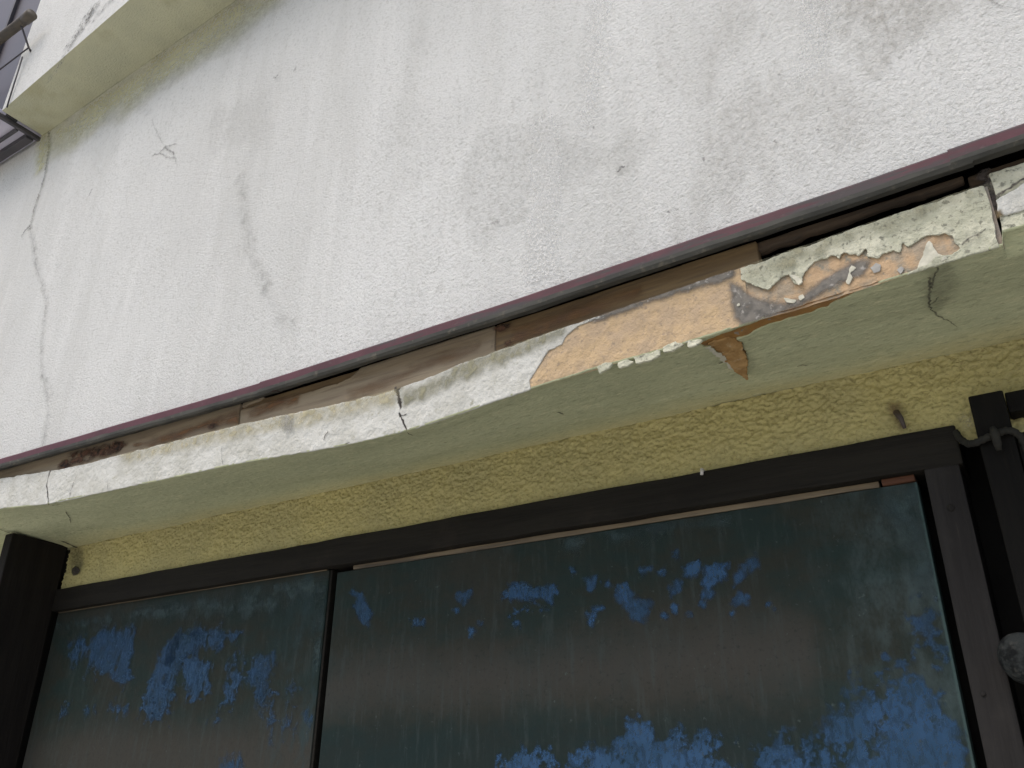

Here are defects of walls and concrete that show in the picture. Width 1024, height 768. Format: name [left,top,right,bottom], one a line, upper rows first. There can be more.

crack [977,168,1024,216]
spalling [530,183,1024,388]
crack [928,267,954,325]
crack [394,387,414,436]